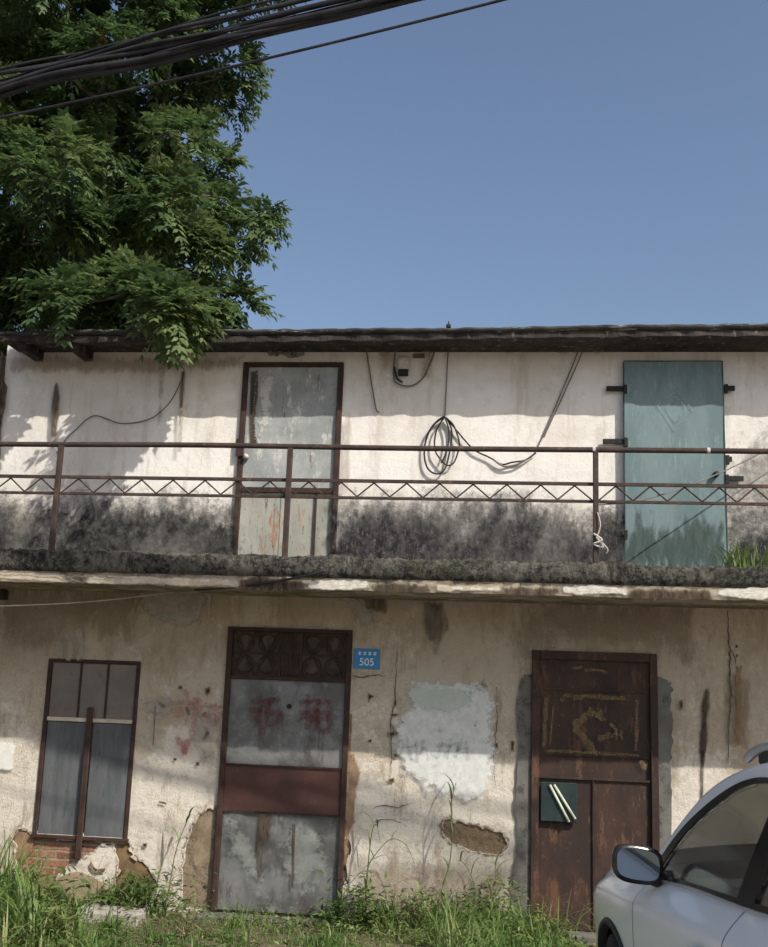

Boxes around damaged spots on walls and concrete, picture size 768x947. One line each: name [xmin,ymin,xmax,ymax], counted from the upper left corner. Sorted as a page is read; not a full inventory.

leakage [0,486,239,555]
leakage [330,489,625,564]
leakage [729,437,768,567]
leakage [376,583,448,641]
crack [353,660,399,778]
crack [727,611,738,764]
spalling [9,825,157,899]
spalling [180,805,234,912]
peeling [230,834,260,880]
corrosion [257,813,270,877]
spalling [343,837,351,885]
spalling [439,817,509,857]